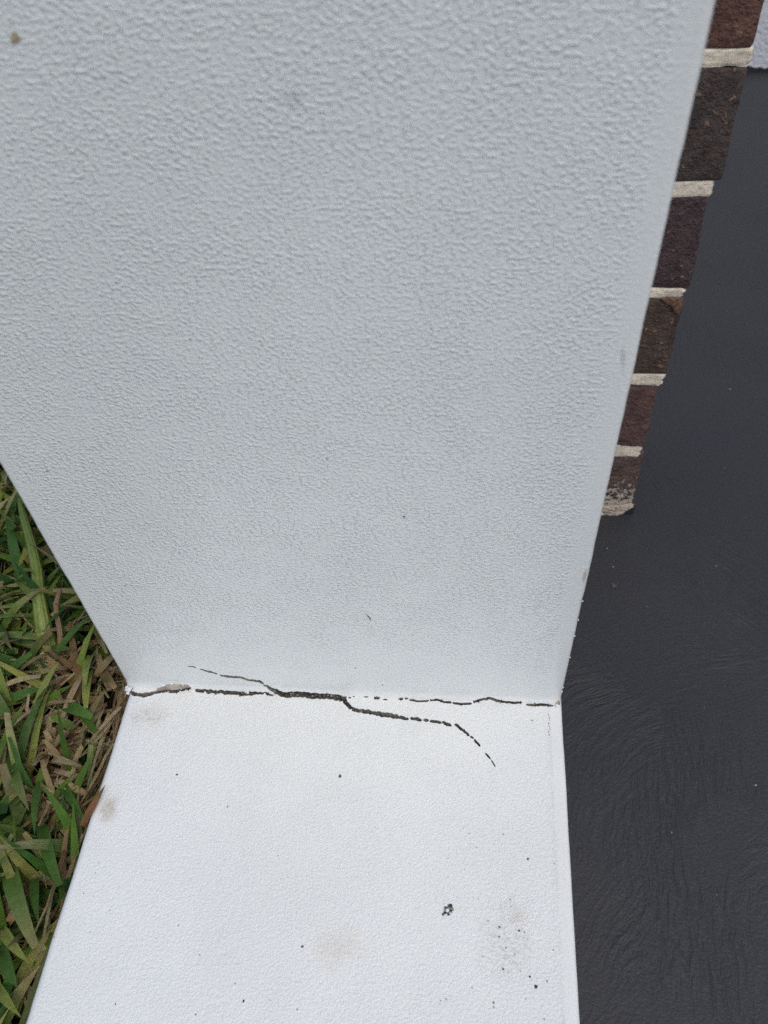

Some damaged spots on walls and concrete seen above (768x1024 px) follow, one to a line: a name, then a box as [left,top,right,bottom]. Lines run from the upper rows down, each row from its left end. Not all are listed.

crack [132,666,554,766]